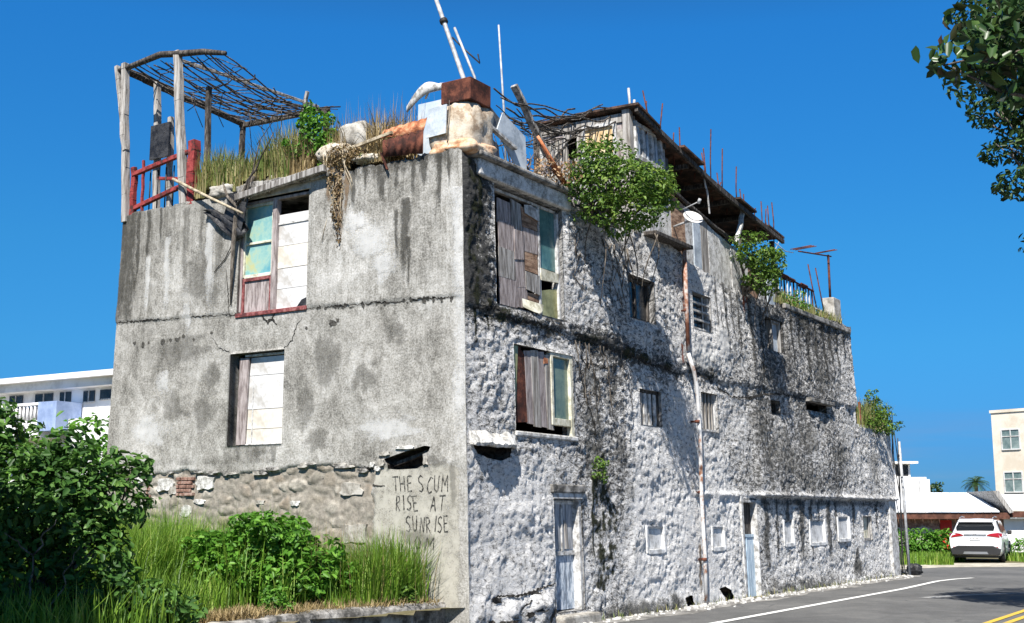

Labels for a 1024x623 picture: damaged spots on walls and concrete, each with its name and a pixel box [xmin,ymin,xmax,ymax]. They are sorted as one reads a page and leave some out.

damp [326,149,451,282]
crack [116,273,454,352]
damp [714,279,765,375]
damp [789,310,848,377]
spalling [107,446,430,558]